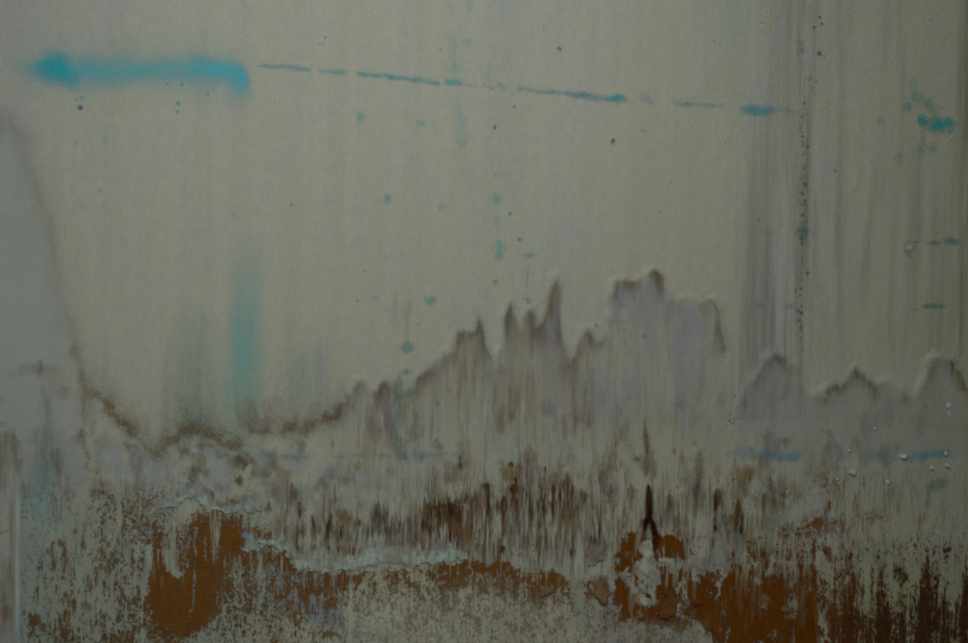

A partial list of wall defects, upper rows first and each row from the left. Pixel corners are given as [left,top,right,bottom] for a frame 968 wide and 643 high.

corrosion [284,516,360,555]
corrosion [359,477,601,564]
peeling [21,491,968,643]
corrosion [643,484,659,549]